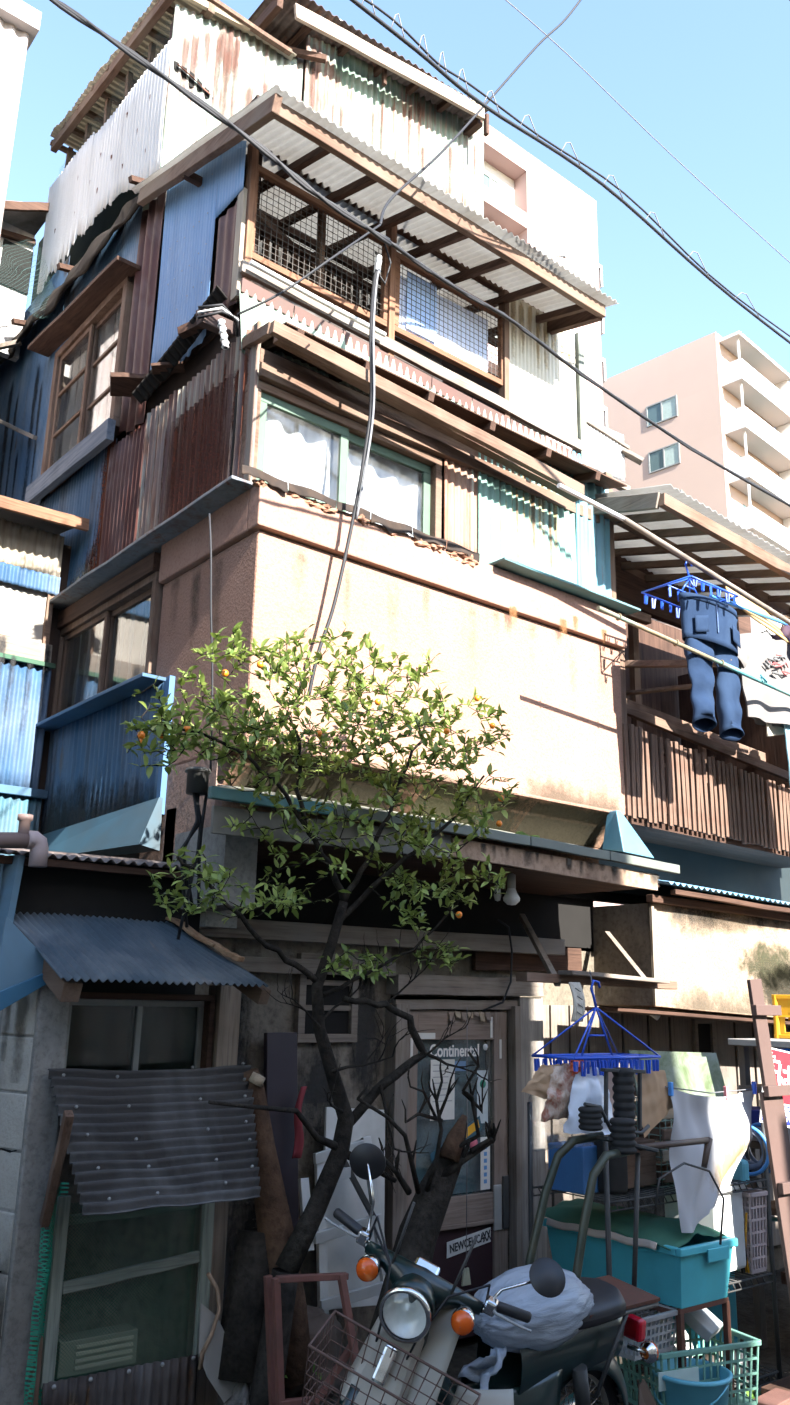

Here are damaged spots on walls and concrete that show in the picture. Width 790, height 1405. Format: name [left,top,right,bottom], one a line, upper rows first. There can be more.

rust [181,33,268,114]
rust [144,352,248,522]
spalling [241,464,480,567]
rust [500,476,557,547]
water stain [672,903,790,1014]